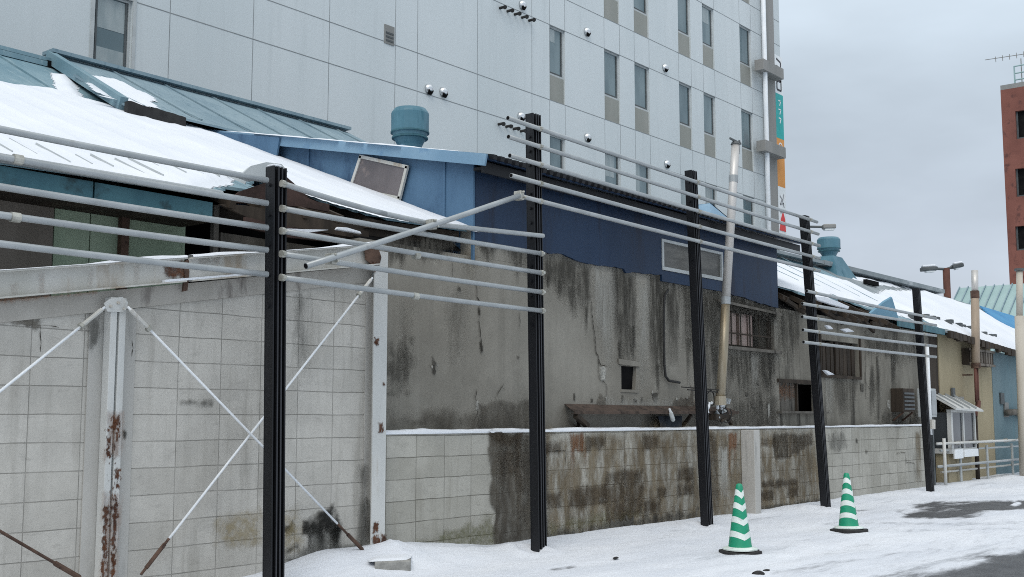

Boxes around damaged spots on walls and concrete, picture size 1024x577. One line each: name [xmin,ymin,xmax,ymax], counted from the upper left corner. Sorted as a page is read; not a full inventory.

damp [546,259,589,302]
damp [614,268,635,356]
damp [650,275,691,381]
damp [703,291,798,372]
damp [868,340,915,397]
rust [100,415,122,577]
damp [285,503,366,561]
rust [373,522,387,544]
damp [481,403,531,544]
damp [546,431,742,537]